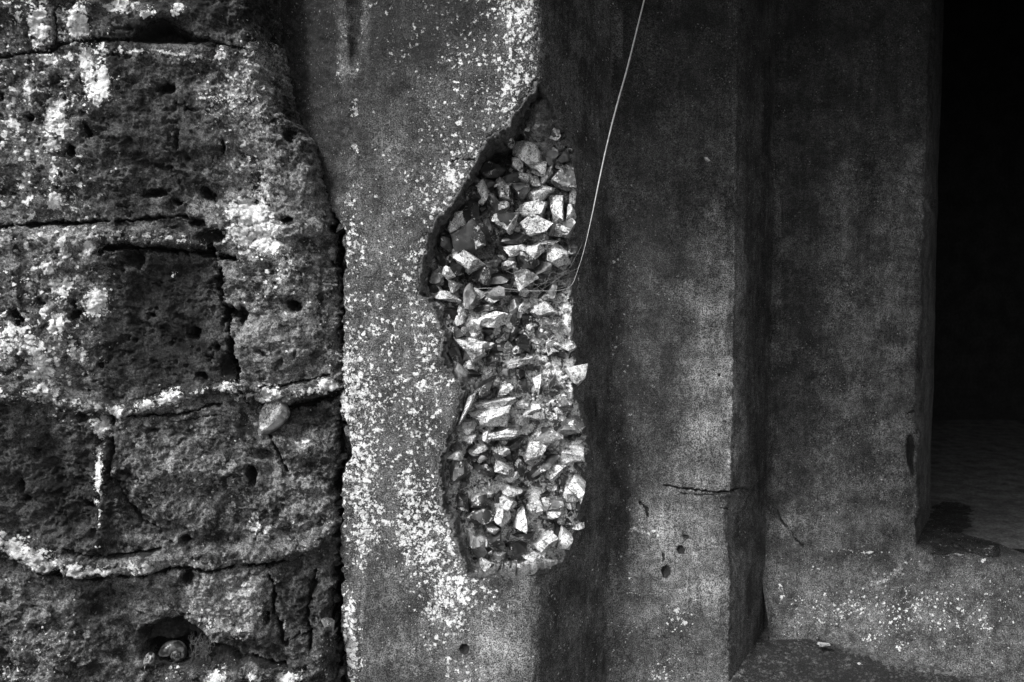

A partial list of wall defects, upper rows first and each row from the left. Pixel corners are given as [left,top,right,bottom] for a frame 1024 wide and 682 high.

spalling [418,81,593,580]
crack [664,485,739,509]